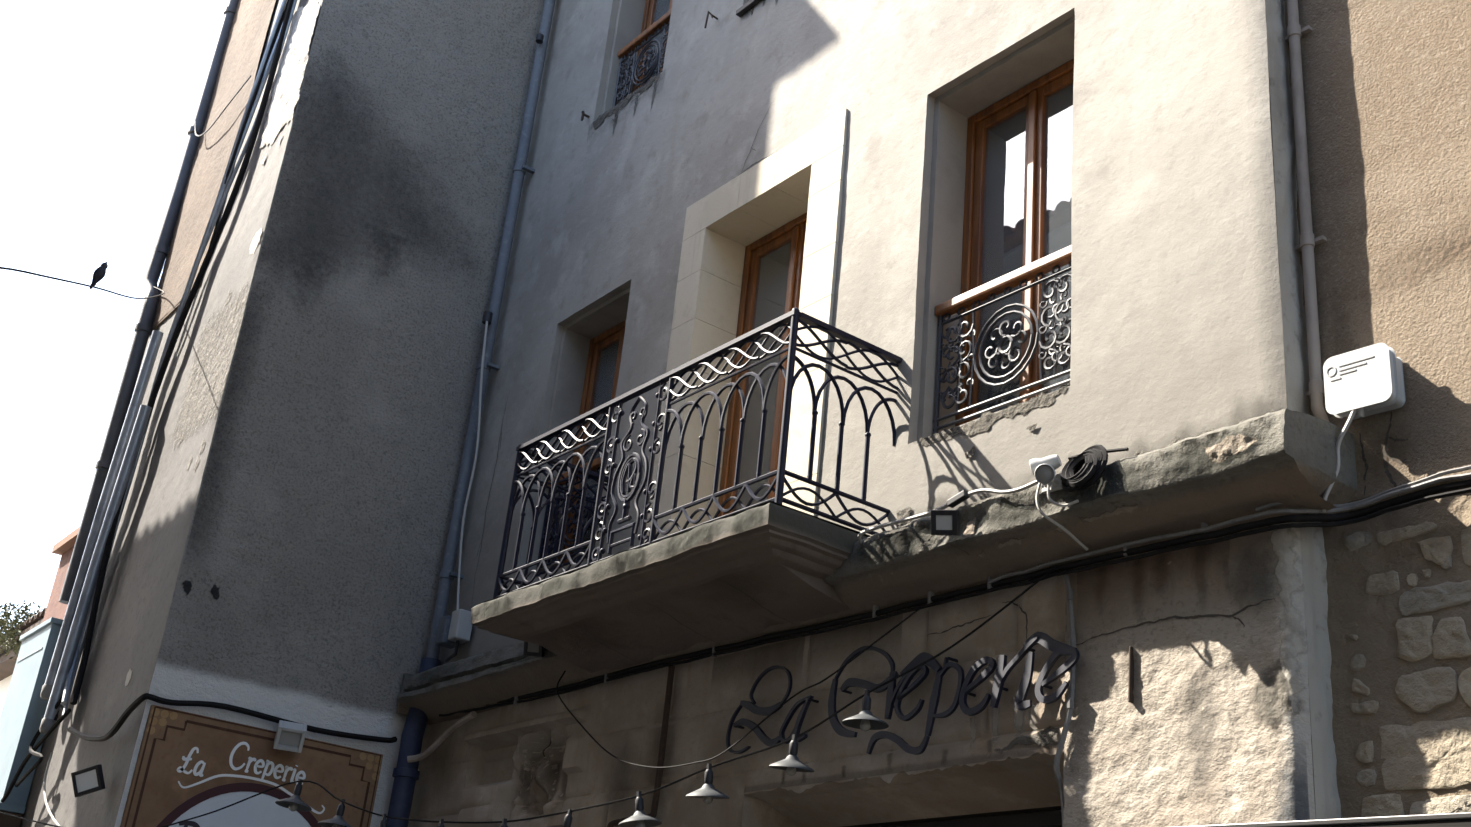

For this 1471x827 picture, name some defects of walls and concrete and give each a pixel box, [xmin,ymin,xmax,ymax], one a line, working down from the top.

peeling [259,0,321,164]
crack [1076,598,1276,645]